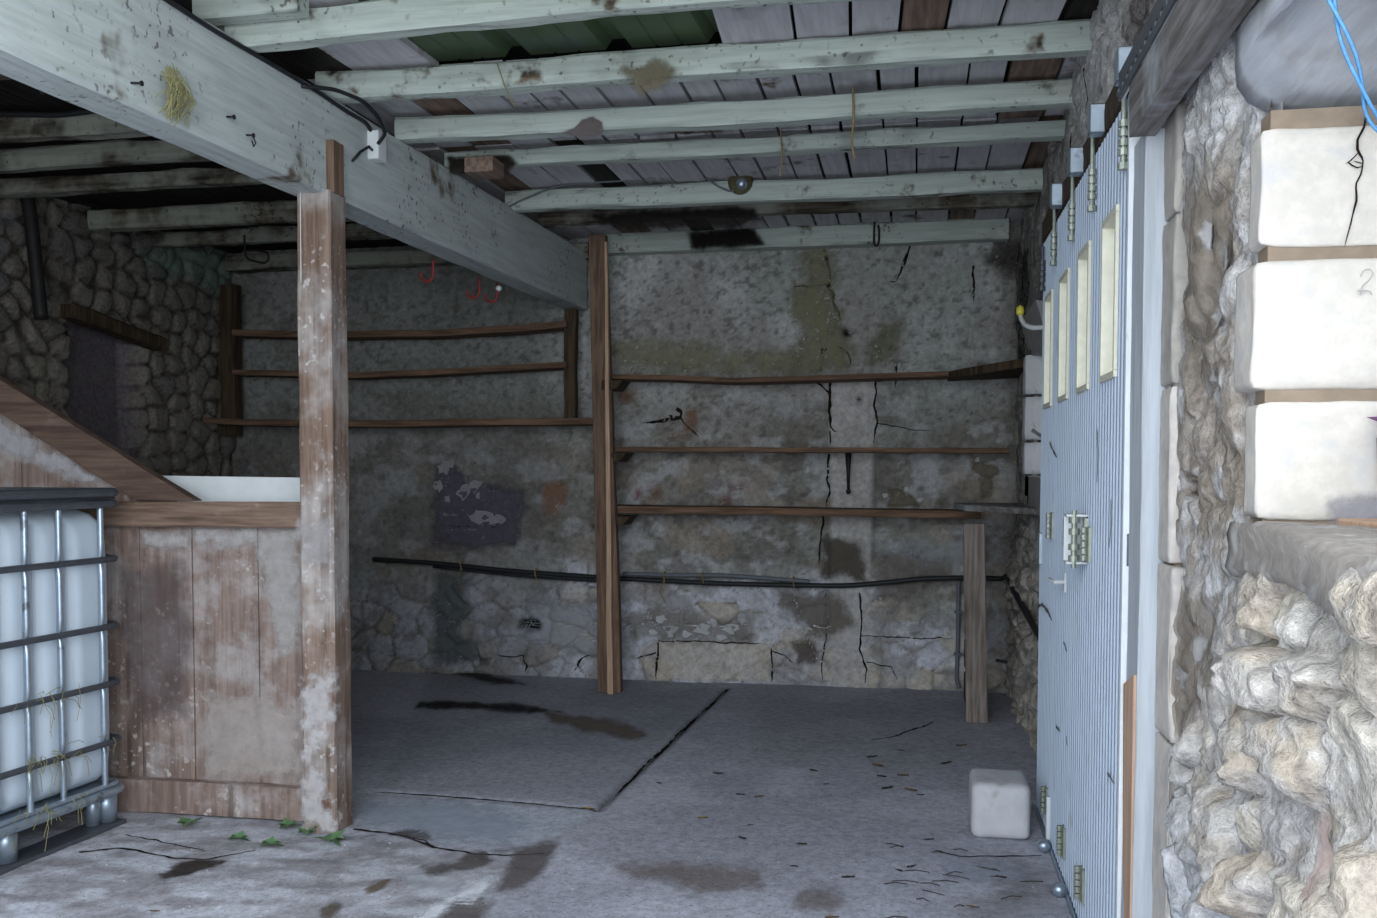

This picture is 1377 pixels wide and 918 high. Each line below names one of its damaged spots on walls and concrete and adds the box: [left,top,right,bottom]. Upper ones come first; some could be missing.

crack [1345,118,1366,245]
crack [643,407,699,437]
crack [794,246,927,561]
damp [431,459,526,550]
crack [637,593,953,682]
damp [780,538,948,664]
damp [391,830,430,839]
damp [407,842,556,918]